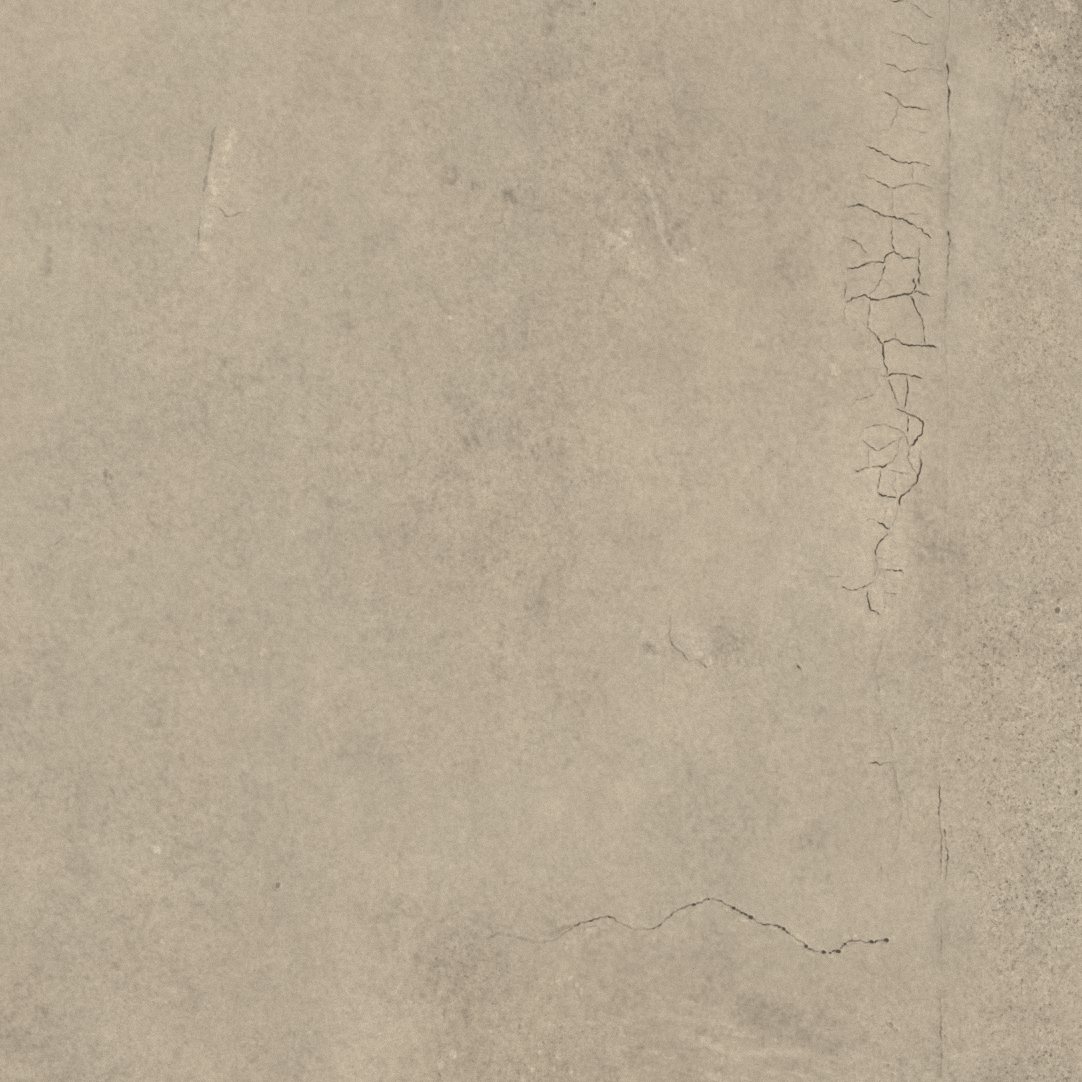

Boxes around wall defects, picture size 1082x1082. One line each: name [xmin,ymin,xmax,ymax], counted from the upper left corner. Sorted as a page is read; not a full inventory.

crack [824,0,954,617]
crack [935,609,951,884]
crack [483,892,896,960]